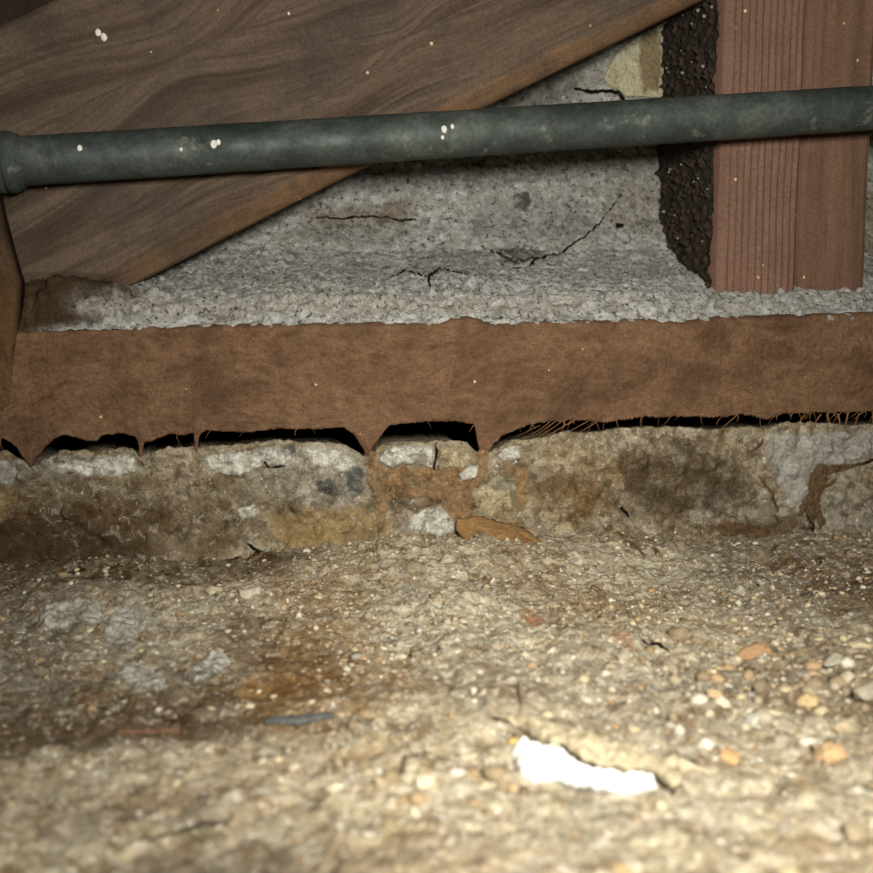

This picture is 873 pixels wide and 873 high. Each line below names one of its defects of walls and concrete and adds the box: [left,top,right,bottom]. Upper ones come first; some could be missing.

crack [311,214,417,222]
crack [482,193,622,270]
crack [392,267,465,287]
crack [466,708,684,795]
crack [663,750,704,766]